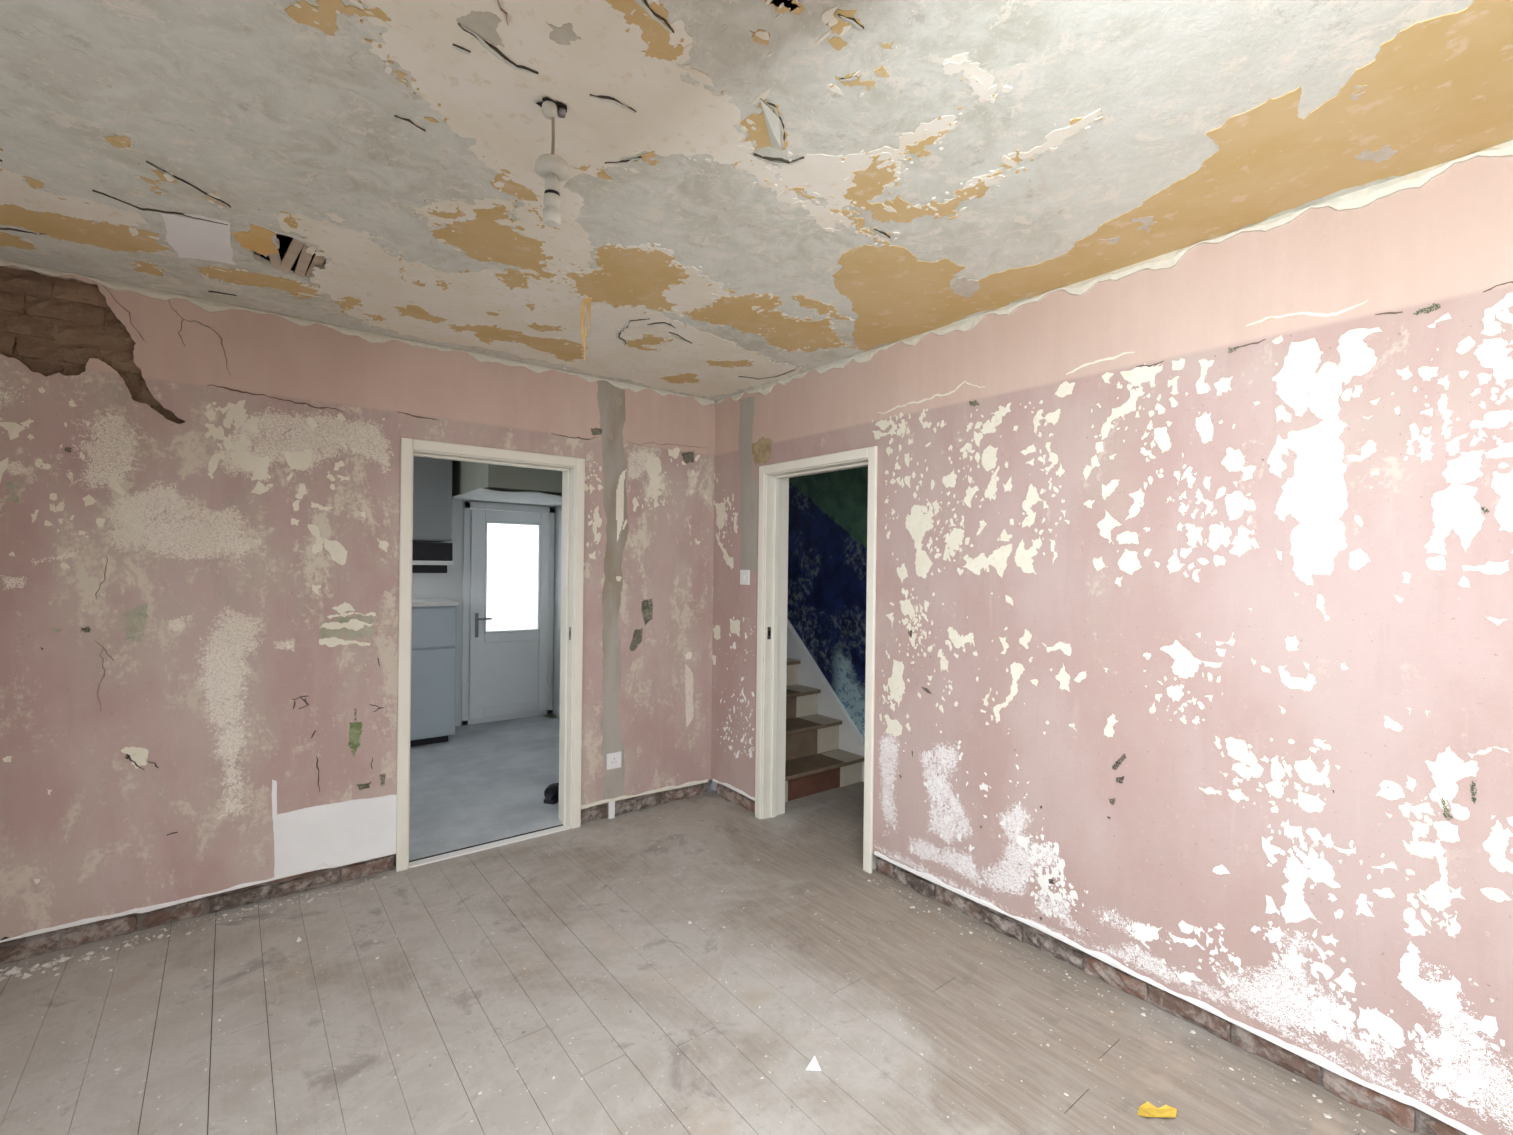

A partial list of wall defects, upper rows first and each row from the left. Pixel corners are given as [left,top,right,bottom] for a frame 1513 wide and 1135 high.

peeling [0,139,170,276]
peeling [197,0,1513,397]
peeling [205,400,394,565]
peeling [584,461,603,565]
peeling [622,447,738,569]
peeling [1083,292,1513,621]
peeling [121,747,149,769]
peeling [167,606,295,821]
peeling [712,614,755,758]
damp [1107,754,1126,819]
peeling [872,381,1513,1135]
flaking render [0,854,395,965]